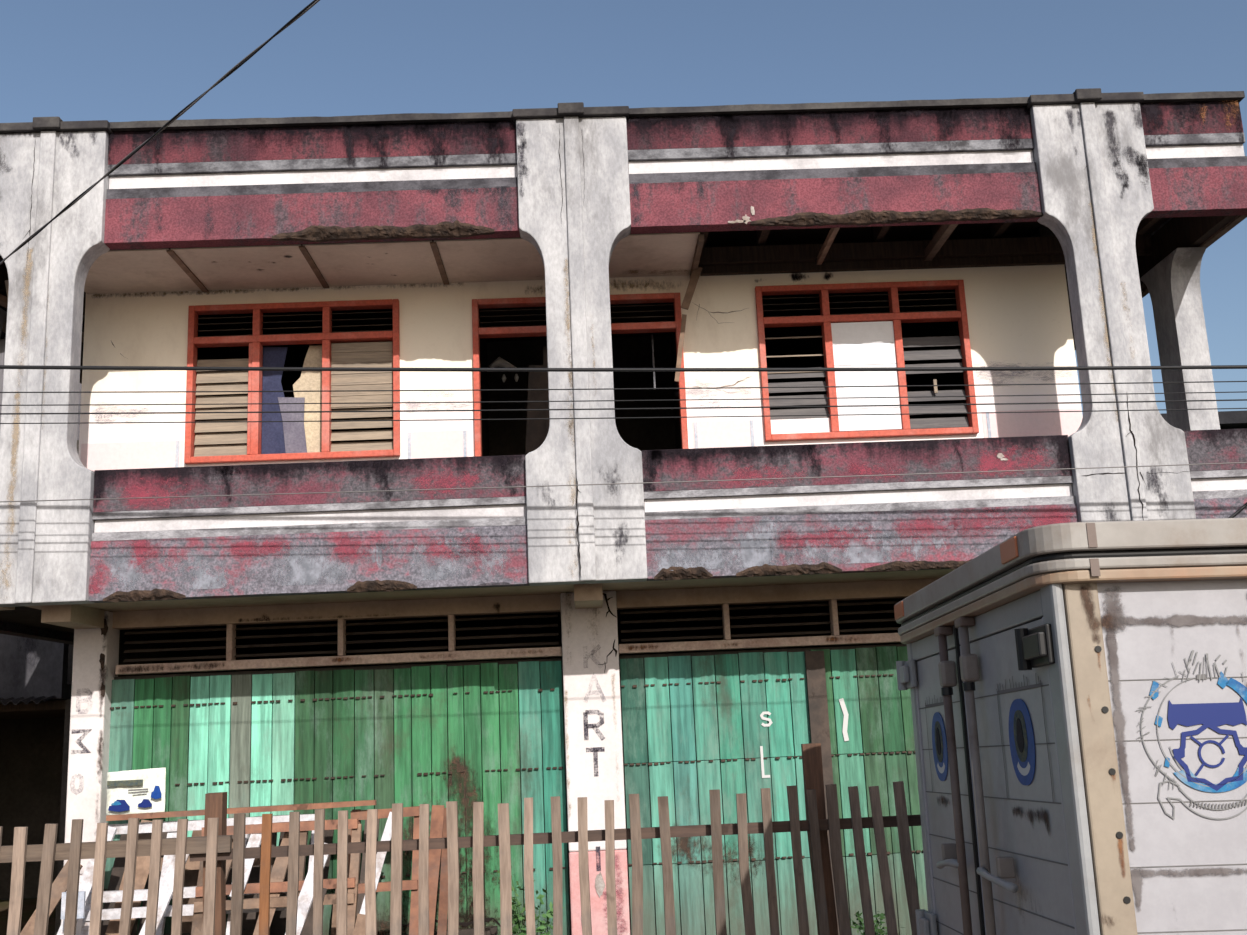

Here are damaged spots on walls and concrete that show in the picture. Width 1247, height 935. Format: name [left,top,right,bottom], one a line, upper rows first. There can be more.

crack [559,130,585,224]
damp [1105,111,1148,198]
damp [1133,102,1165,146]
damp [9,393,19,532]
crack [1083,396,1189,520]
flaking render [275,539,503,592]
crack [576,478,617,673]
flaking render [654,517,972,580]
flaking render [97,548,227,716]